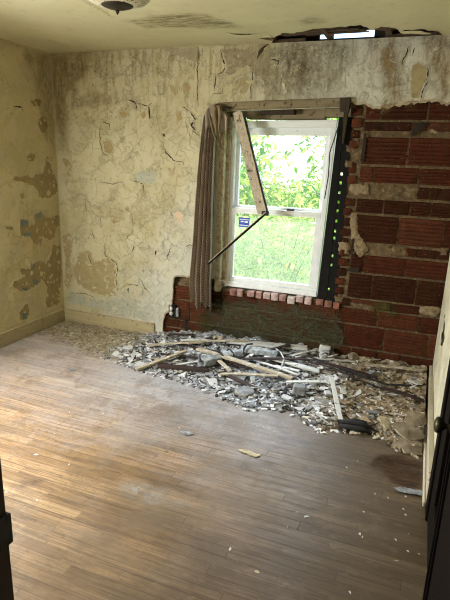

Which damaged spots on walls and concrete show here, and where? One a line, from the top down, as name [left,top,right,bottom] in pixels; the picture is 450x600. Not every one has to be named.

peeling [11,155,58,200]
peeling [3,210,118,309]
crack [99,180,151,194]
crack [67,192,192,302]
crack [127,100,153,119]
crack [161,134,184,165]
crack [181,47,228,136]
spalling [163,60,450,380]
water stain [380,45,400,108]
water stain [376,413,427,507]